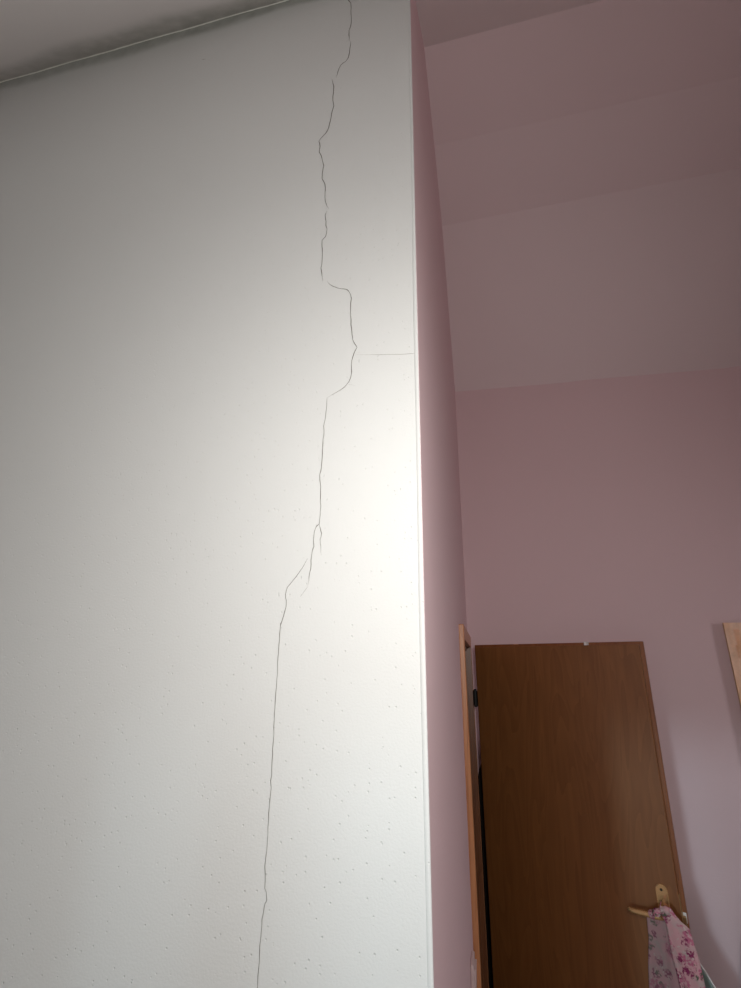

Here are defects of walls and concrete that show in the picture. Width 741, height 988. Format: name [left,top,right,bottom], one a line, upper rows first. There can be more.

crack [257,0,414,988]